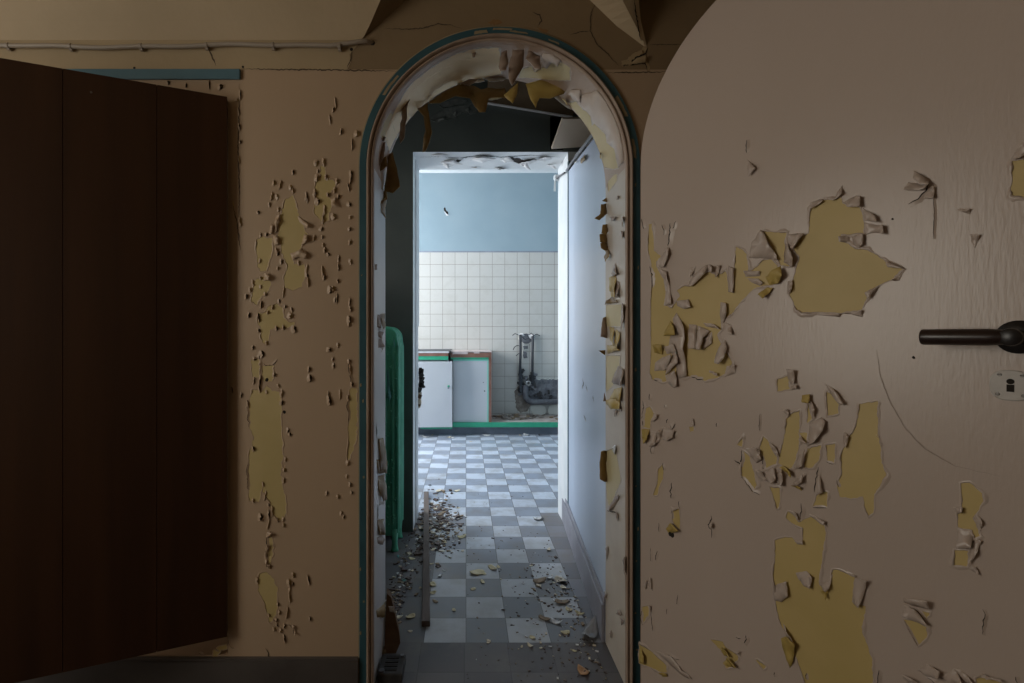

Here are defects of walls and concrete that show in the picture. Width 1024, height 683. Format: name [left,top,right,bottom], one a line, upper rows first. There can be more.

peeling [1006,143,1024,202]
peeling [379,39,906,454]
peeling [231,158,340,569]
peeling [599,445,622,521]
peeling [733,369,891,683]
peeling [948,480,989,576]
peeling [636,641,692,679]
peeling [902,598,932,648]